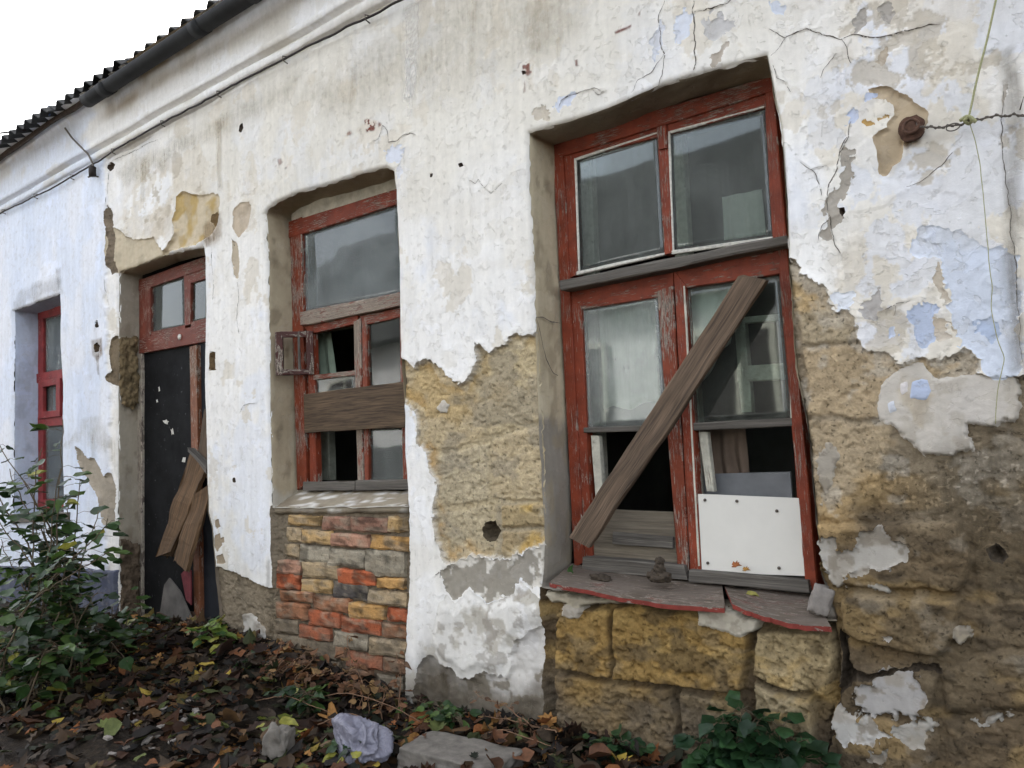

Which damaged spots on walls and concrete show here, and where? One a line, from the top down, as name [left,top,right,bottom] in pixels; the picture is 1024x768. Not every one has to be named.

crack [634,1,665,88]
crack [770,24,938,92]
spalling [845,86,929,176]
crack [804,122,851,252]
spalling [103,191,220,275]
peeling [232,202,251,279]
spalling [105,336,140,410]
spalling [75,446,117,525]
spalling [401,332,625,619]
spalling [789,225,1024,768]
spalling [411,625,546,724]